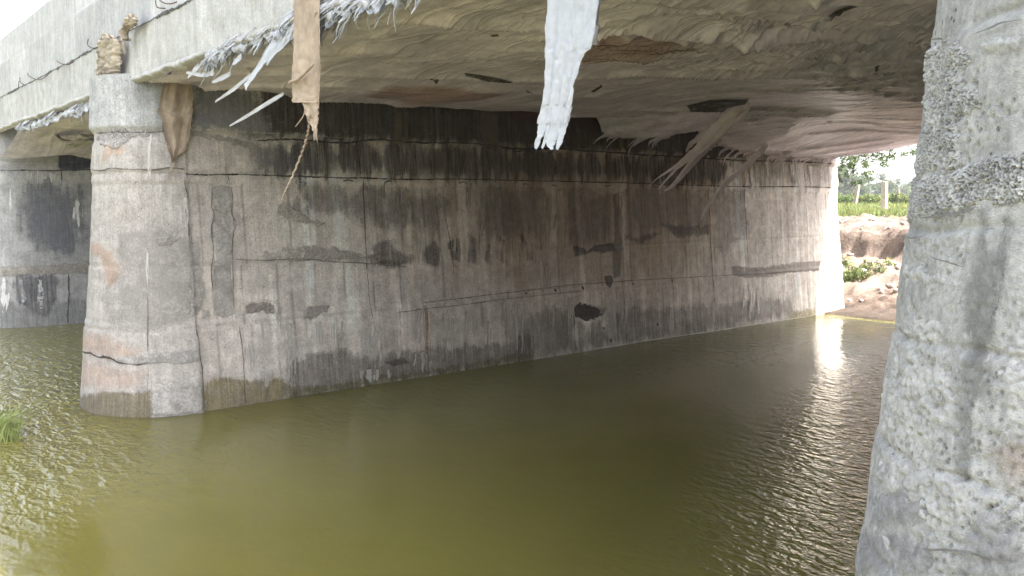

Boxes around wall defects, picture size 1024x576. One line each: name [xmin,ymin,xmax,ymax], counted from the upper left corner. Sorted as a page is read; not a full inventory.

water stain [9,155,91,256]
water stain [192,86,823,290]
water stain [0,274,67,326]
crack [0,138,838,411]
water stain [275,279,785,392]